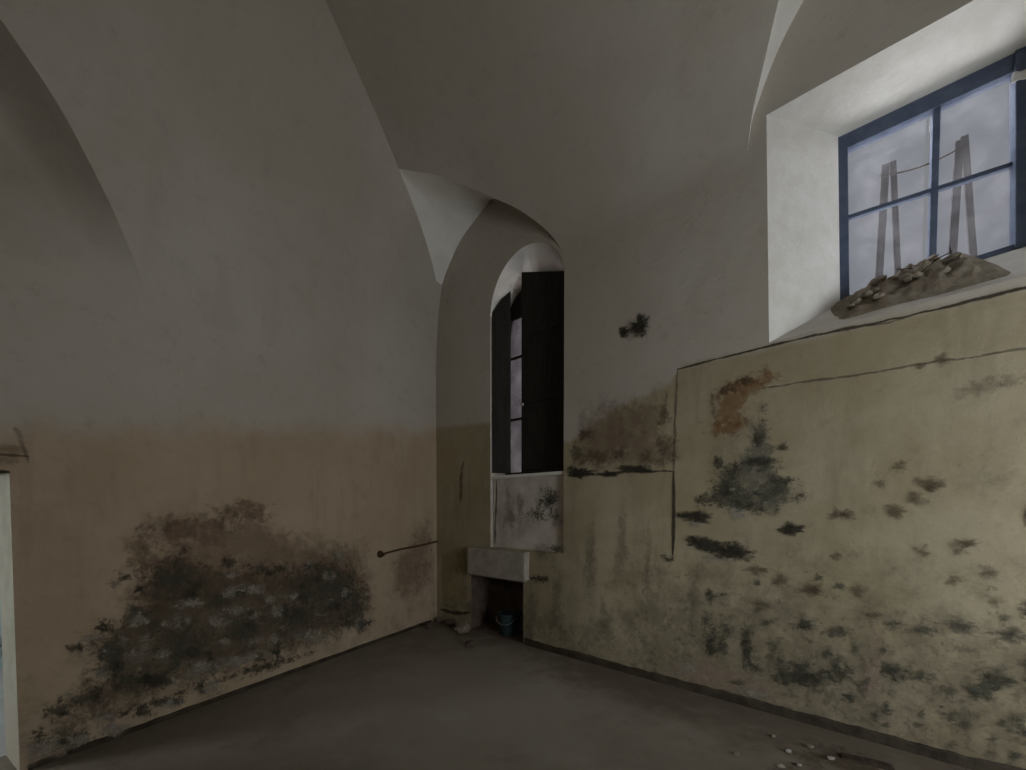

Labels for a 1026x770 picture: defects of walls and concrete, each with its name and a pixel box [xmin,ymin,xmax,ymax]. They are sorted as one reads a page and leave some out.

water stain [695,404,804,520]
crack [566,286,1026,562]
water stain [26,545,372,760]
water stain [704,589,869,702]
water stain [914,619,975,636]
water stain [879,648,1026,729]